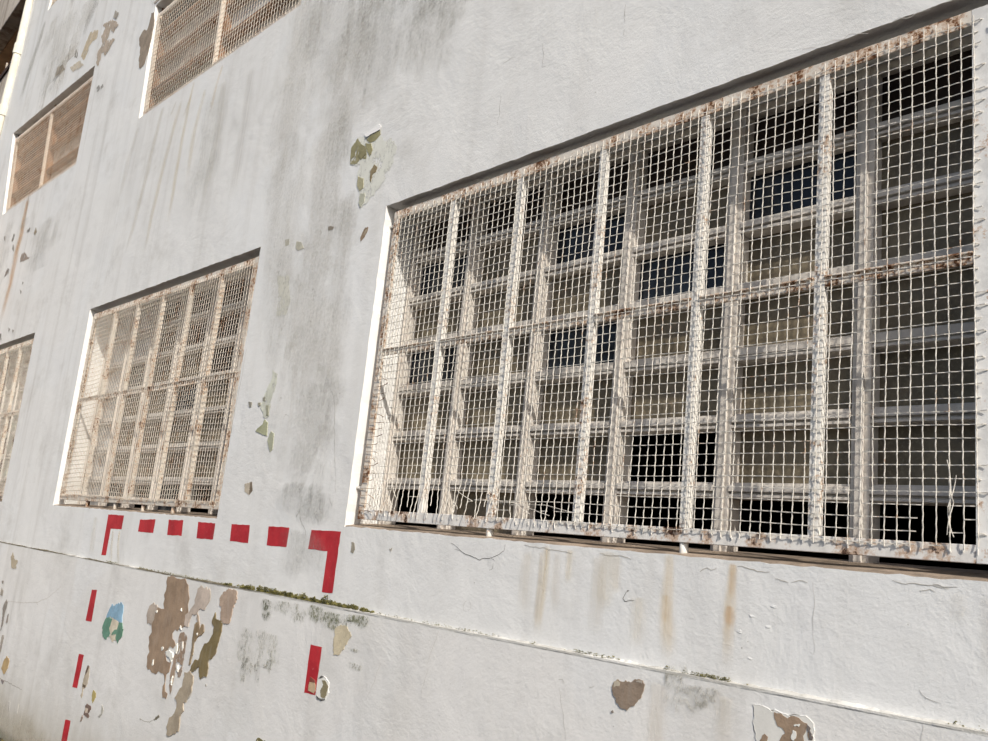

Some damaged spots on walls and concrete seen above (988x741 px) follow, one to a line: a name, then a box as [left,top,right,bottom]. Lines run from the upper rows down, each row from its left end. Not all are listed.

peeling [55,10,119,77]
peeling [139,0,159,68]
peeling [350,124,397,209]
peeling [248,369,278,452]
peeling [0,581,10,684]
peeling [102,602,124,643]
peeling [146,576,237,737]
peeling [333,625,351,656]
peeling [611,679,645,713]
peeling [753,704,815,741]